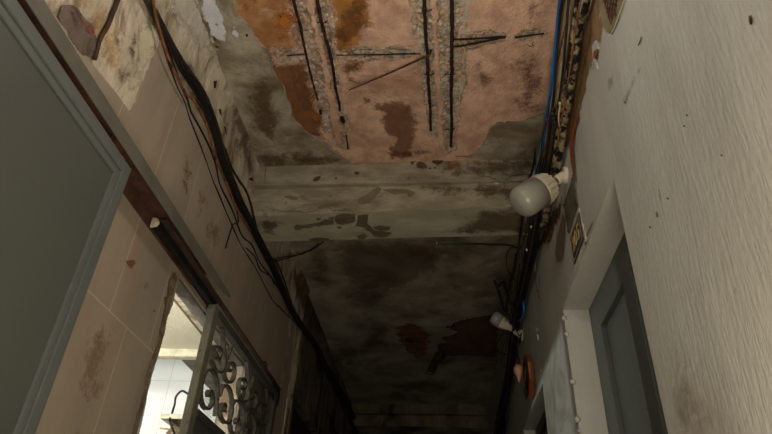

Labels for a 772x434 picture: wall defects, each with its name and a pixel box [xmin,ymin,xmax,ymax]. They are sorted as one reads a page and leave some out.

rust [233,0,297,51]
rust [331,0,371,51]
leakage [249,82,278,139]
leakage [234,108,340,173]
rust [273,60,322,137]
leakage [345,62,364,82]
flaking render [195,0,547,174]
leakage [364,98,425,159]
peeling [592,40,600,69]